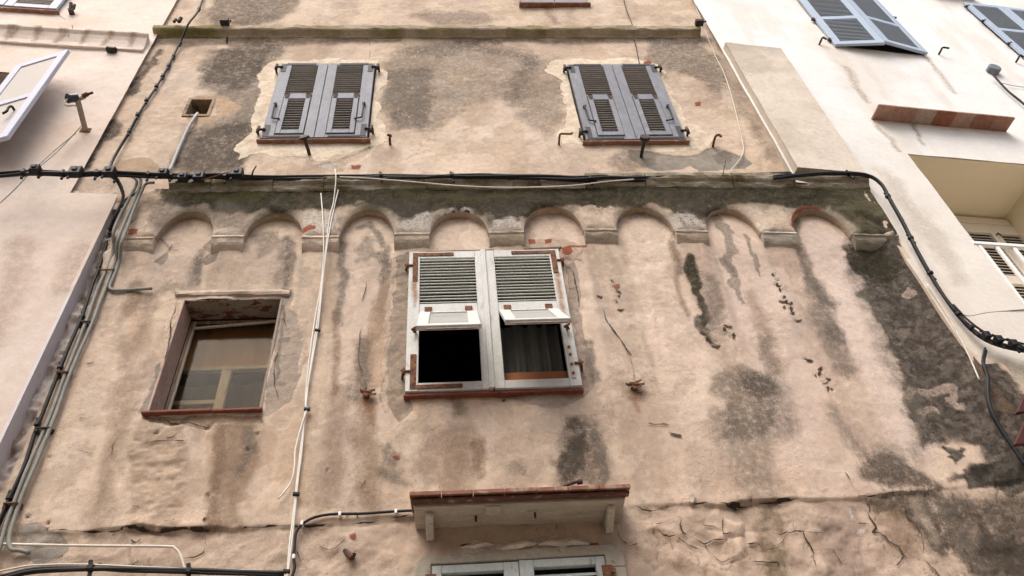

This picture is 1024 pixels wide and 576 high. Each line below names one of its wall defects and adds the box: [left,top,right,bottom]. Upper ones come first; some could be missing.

leakage [175,42,282,173]
leakage [382,68,431,127]
leakage [670,200,759,346]
flaking render [138,288,309,435]
leakage [843,210,1024,576]
leakage [557,420,607,485]
crack [57,519,210,566]
crack [617,498,841,571]
crack [846,473,939,576]